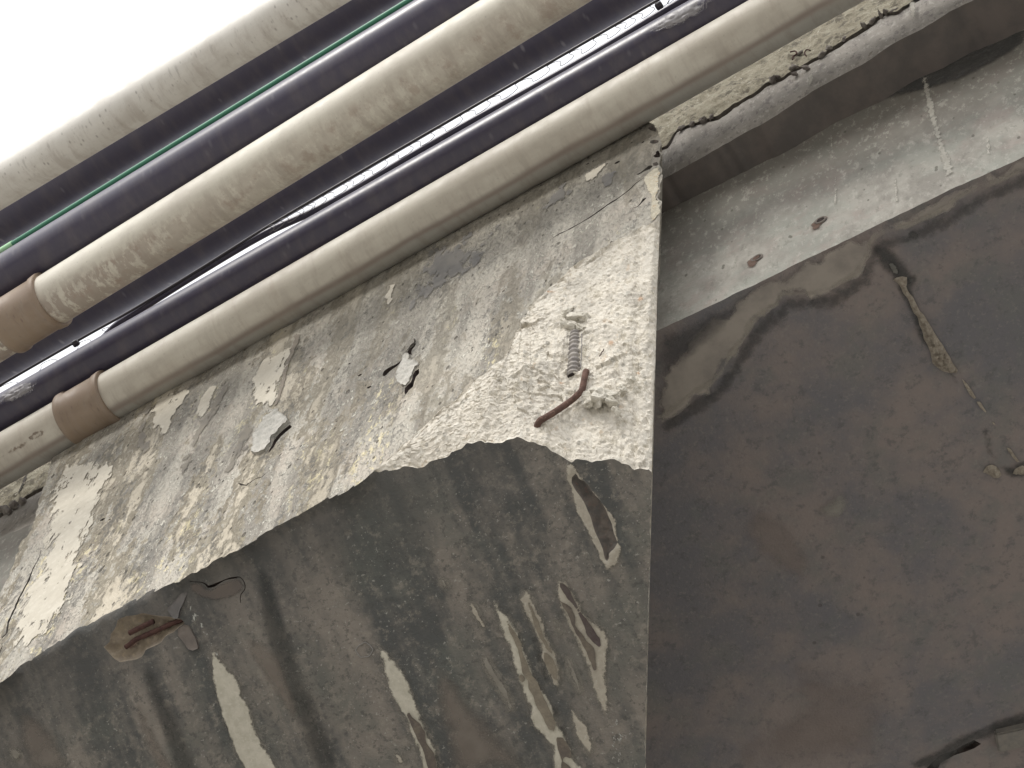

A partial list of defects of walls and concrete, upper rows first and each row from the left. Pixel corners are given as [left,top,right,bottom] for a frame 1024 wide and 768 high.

crack [662,8,903,150]
crack [553,178,644,238]
peeling [151,389,189,435]
peeling [251,348,292,455]
spalling [373,125,662,472]
damp [660,242,986,420]
crack [0,552,41,652]
crack [0,475,43,518]
peeling [13,461,113,647]
damp [201,623,275,768]
damp [381,651,437,768]
damp [494,605,594,768]